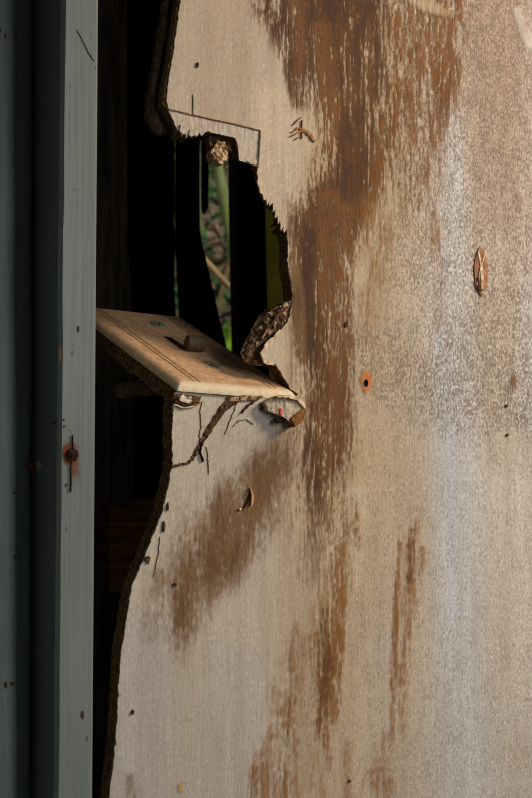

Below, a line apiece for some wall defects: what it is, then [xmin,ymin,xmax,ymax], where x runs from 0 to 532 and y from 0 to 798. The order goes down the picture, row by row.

peeling [167,108,261,168]
peeling [260,329,281,366]
spalling [173,394,201,408]
crack [171,395,264,474]
peeling [260,395,306,427]
rust [361,371,372,394]
rust [63,435,79,492]
peeling [239,488,254,511]
rust [311,504,361,767]
rust [391,526,425,734]